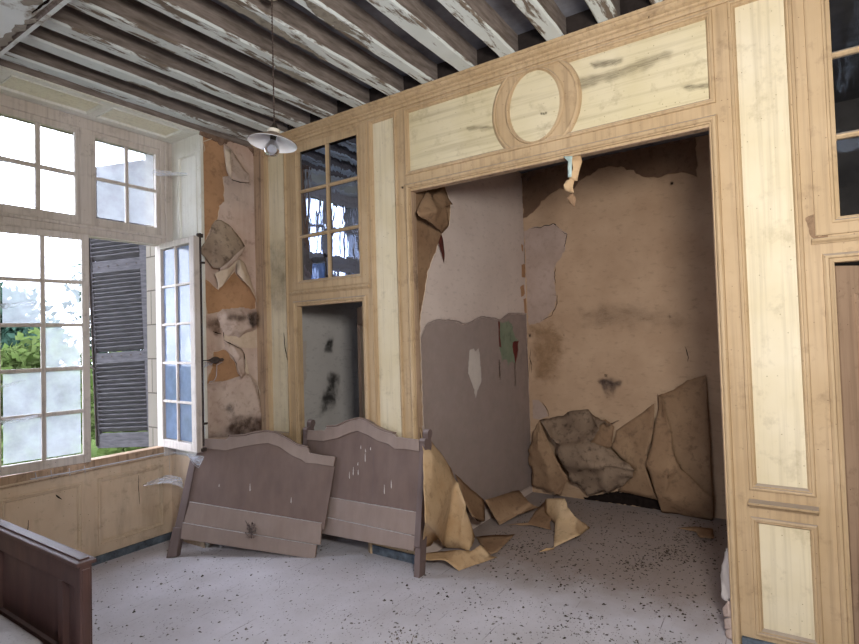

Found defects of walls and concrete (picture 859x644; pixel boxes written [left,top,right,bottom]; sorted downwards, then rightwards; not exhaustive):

peeling [0,18,39,50]
peeling [219,0,329,63]
peeling [306,0,356,35]
peeling [521,137,698,218]
peeling [199,131,257,314]
peeling [417,187,452,233]
peeling [207,341,249,385]